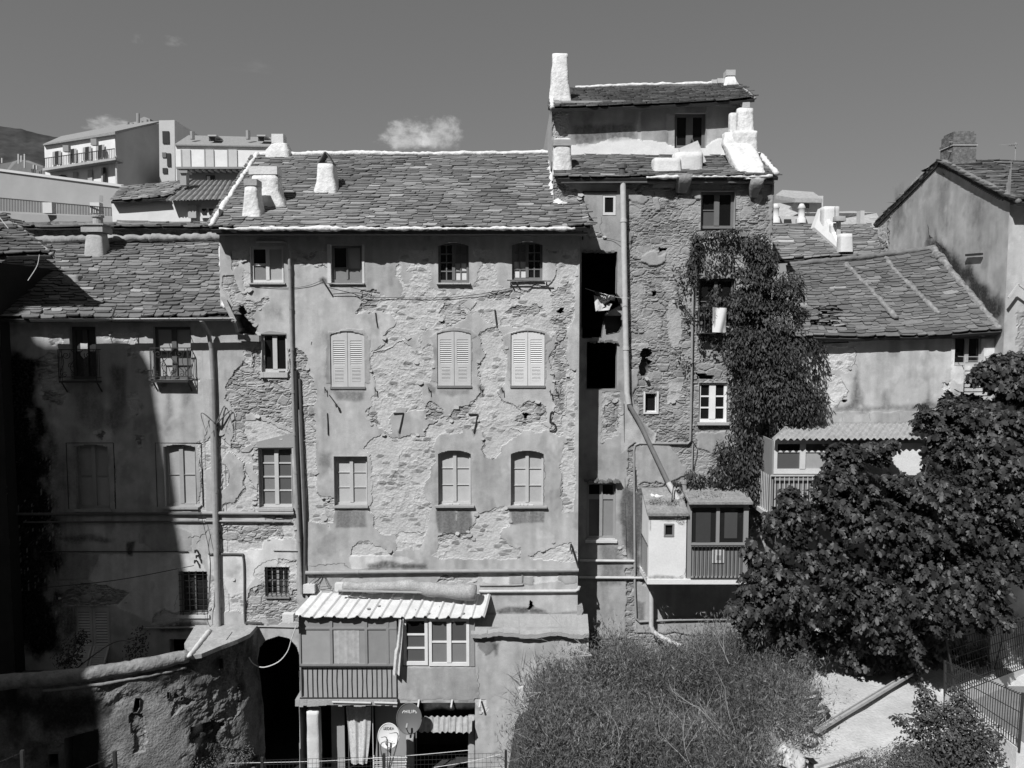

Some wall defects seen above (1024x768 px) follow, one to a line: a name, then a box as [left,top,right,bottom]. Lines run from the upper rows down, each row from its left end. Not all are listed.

flaking render [291,250,327,269]
spalling [230,250,269,366]
flaking render [666,300,685,348]
flaking render [629,343,649,351]
flaking render [350,249,579,563]
flaking render [666,381,685,405]
flaking render [195,414,334,553]
flaking render [207,572,265,615]
flaking render [278,559,297,590]